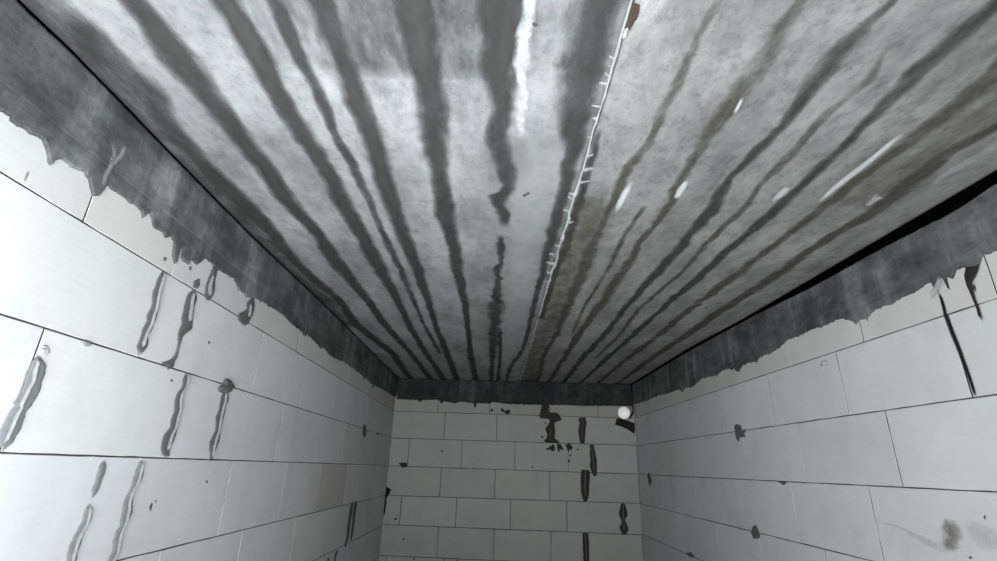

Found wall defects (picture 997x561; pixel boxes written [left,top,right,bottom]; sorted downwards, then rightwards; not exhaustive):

rust [623,3,640,39]
leakage [21,0,997,384]
crack [939,295,976,395]